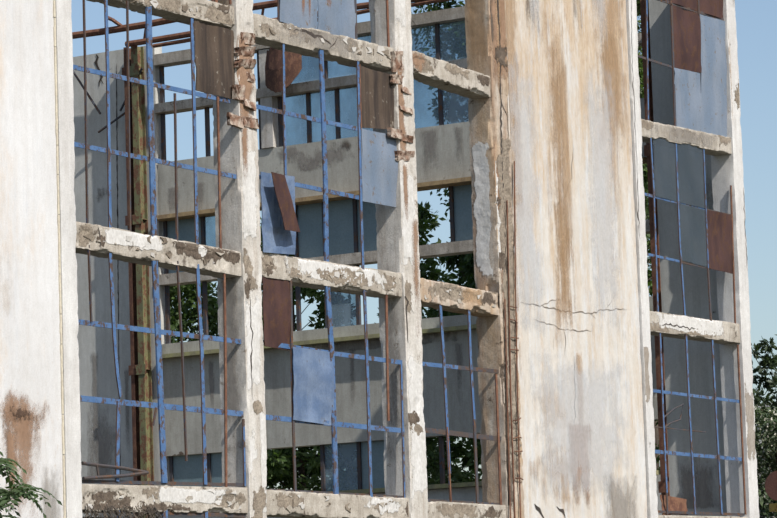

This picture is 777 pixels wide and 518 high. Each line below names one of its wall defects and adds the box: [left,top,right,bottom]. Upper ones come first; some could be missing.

spalling [128,0,233,25]
corrosion [412,51,425,72]
spalling [444,63,490,86]
corrosion [466,0,523,205]
spalling [495,45,508,68]
corrosion [604,0,620,169]
corrosion [552,70,570,309]
flaking render [76,151,413,390]
spalling [424,134,524,518]
crack [520,298,625,421]
corrosion [0,390,46,488]
flaking render [82,400,305,518]